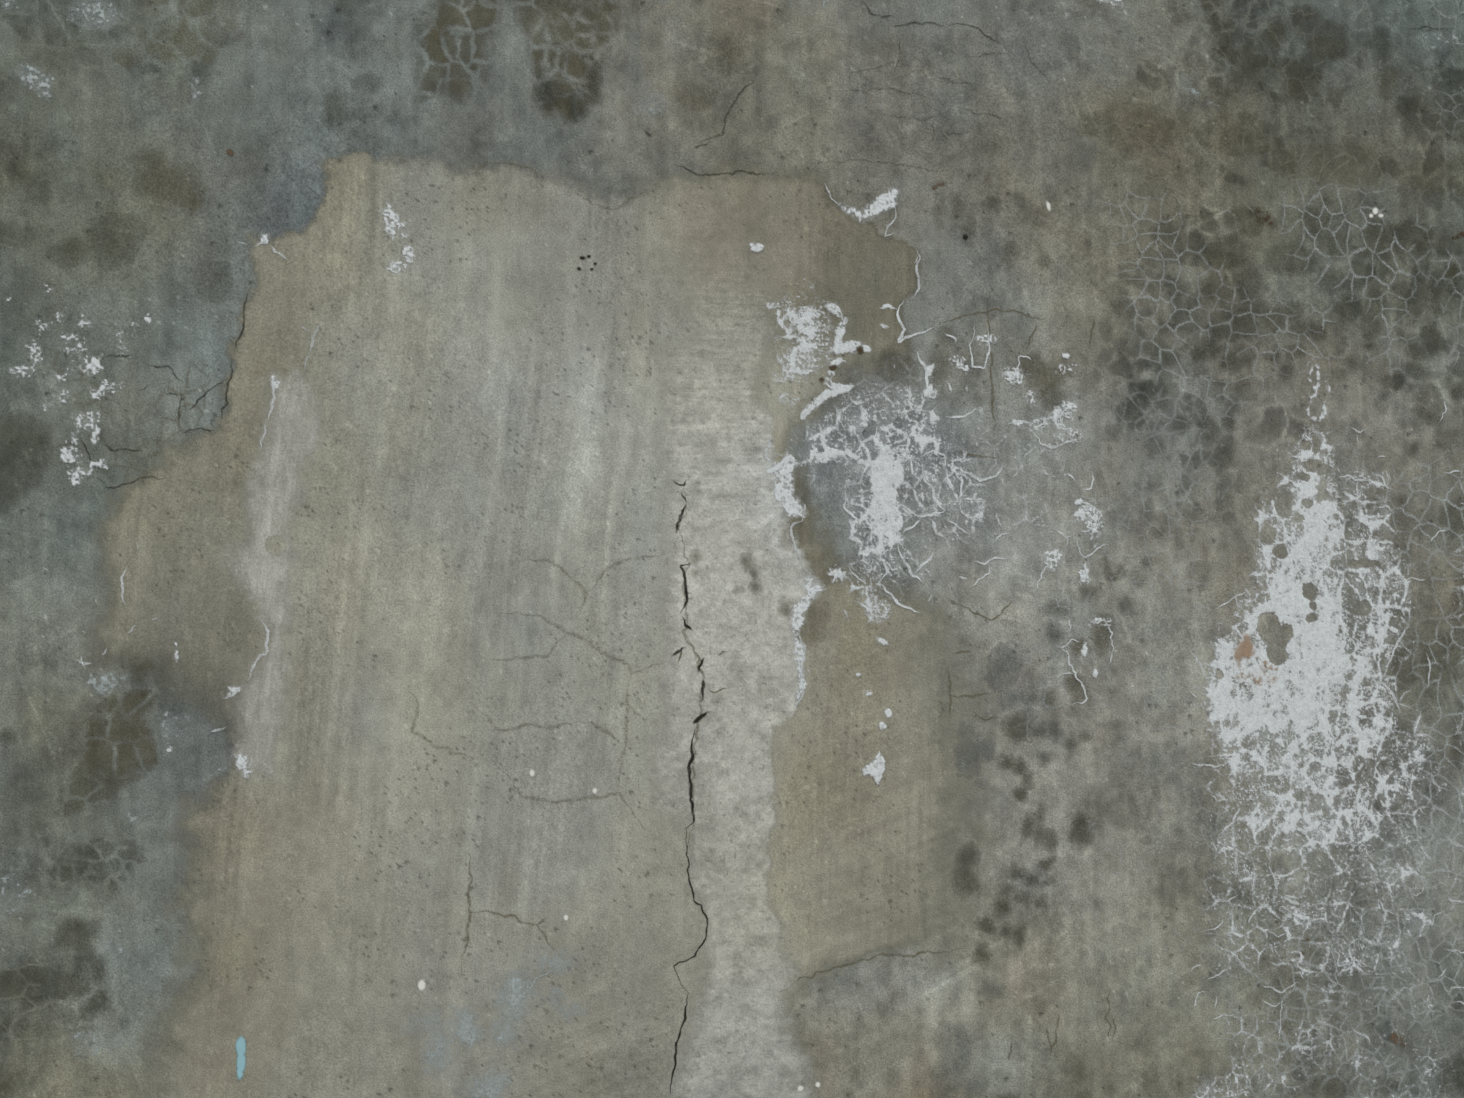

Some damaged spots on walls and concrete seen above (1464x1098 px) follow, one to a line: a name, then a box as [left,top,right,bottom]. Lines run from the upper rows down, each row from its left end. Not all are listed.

water stain [424,0,496,93]
water stain [525,0,612,118]
water stain [825,185,898,236]
water stain [765,252,1104,705]
flaking render [652,211,822,1098]
water stain [1050,603,1122,705]
water stain [68,657,187,805]
crack [670,480,726,1093]
flaking render [862,751,885,784]
water stain [1189,366,1464,1098]
crack [1276,472,1464,1066]